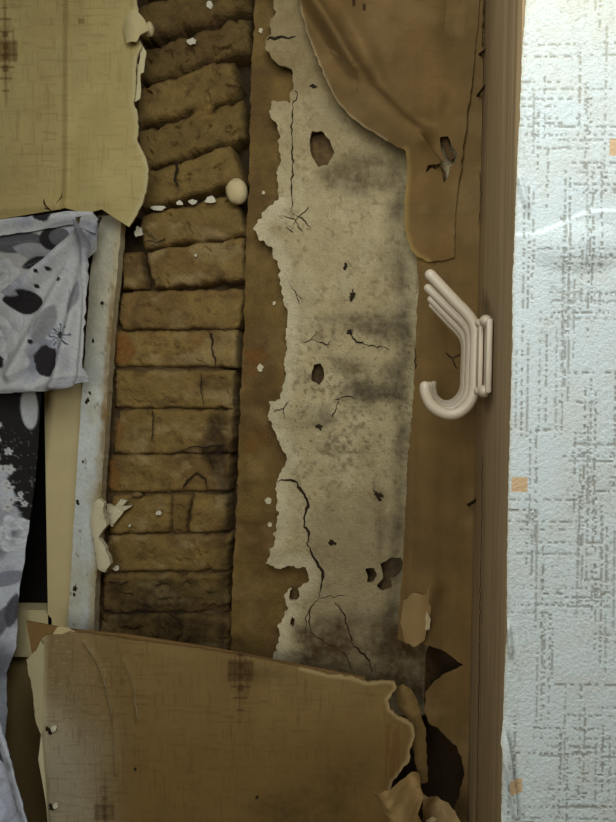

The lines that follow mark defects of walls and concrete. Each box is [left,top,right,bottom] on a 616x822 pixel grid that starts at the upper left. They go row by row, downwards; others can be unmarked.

peeling [135,45,146,102]
flaking render [310,132,334,167]
flaking render [231,0,309,659]
flaking render [312,363,324,385]
crack [277,479,372,672]
flaking render [366,557,403,590]